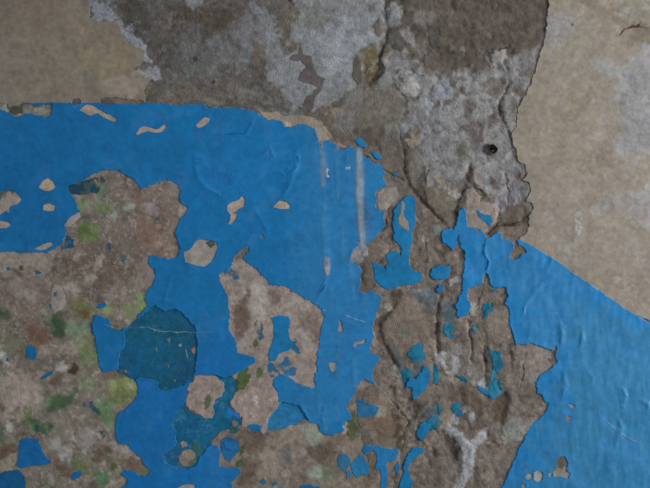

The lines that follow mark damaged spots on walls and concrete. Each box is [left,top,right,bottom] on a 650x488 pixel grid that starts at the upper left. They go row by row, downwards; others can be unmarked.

peeling [0,170,218,488]
flaking render [72,0,557,488]
leakage [347,148,371,250]
peeling [522,456,570,488]